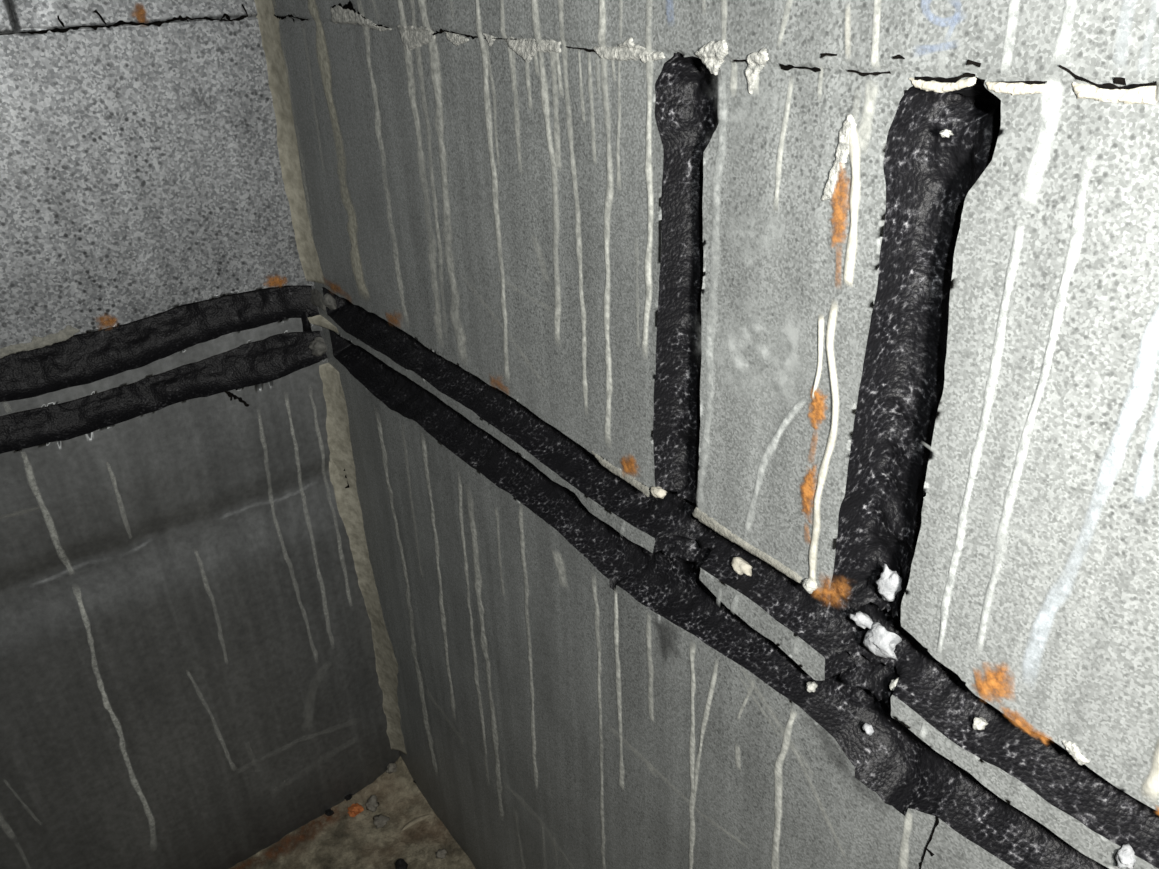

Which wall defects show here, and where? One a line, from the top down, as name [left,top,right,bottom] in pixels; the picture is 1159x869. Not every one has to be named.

crack [0,0,389,35]
crack [432,29,536,42]
crack [566,45,595,53]
crack [779,53,1157,90]
leakage [397,0,465,357]
leakage [500,0,620,440]
leakage [642,28,653,353]
corrosion [832,173,847,243]
corrosion [808,391,824,429]
leakage [938,228,1022,650]
corrosion [801,468,815,515]
corrosion [975,668,1048,744]